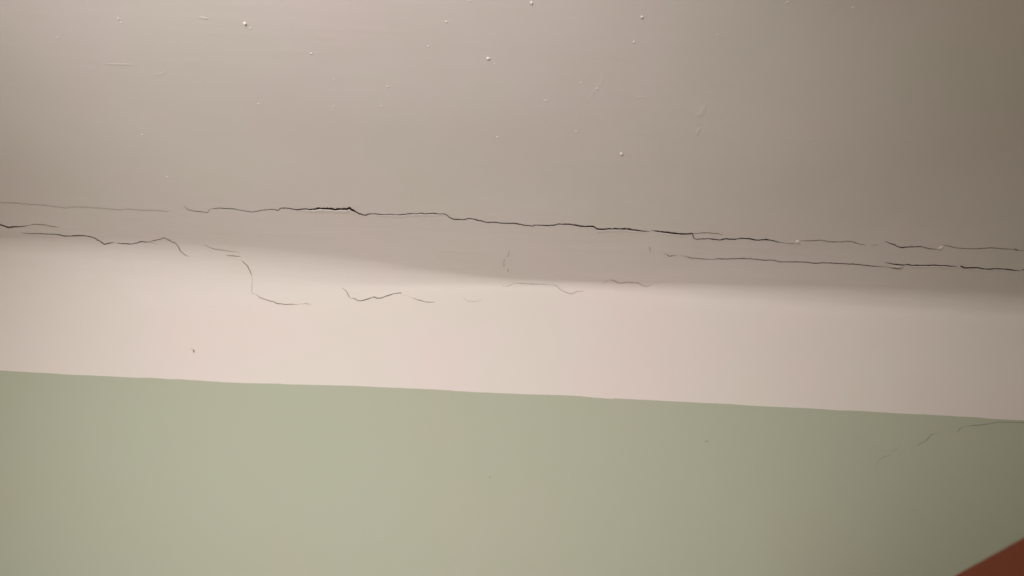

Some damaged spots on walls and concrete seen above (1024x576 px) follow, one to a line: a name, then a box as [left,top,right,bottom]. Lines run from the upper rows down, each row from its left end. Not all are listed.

crack [0,202,1024,305]